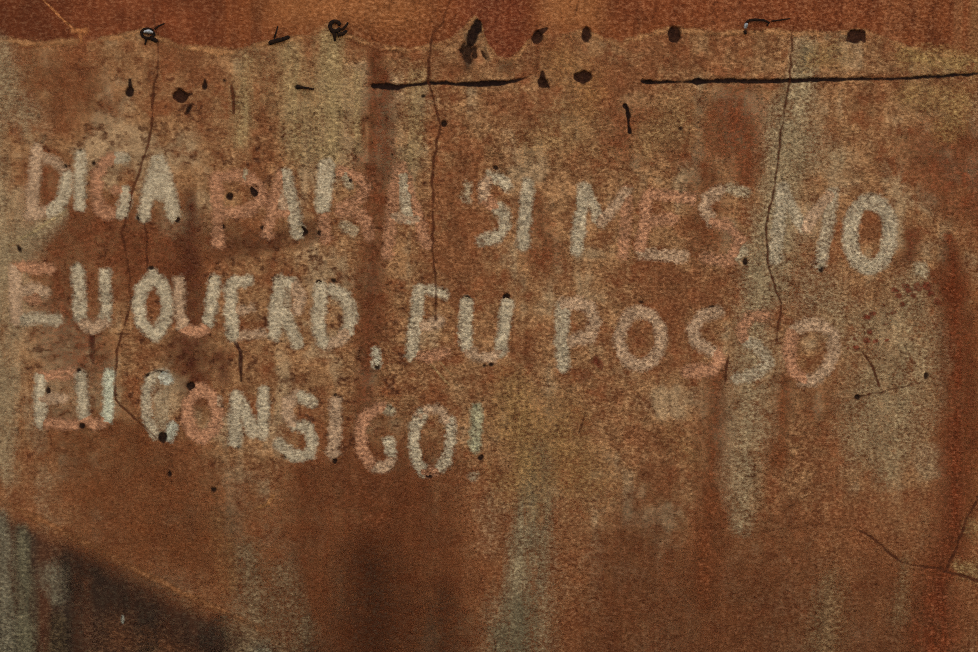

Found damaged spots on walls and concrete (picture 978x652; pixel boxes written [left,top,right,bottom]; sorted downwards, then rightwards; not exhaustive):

crack [371,19,523,320]
crack [641,37,978,342]
leakage [0,516,33,652]
rust [234,341,243,380]
leakage [72,457,446,652]
rust [847,234,975,652]